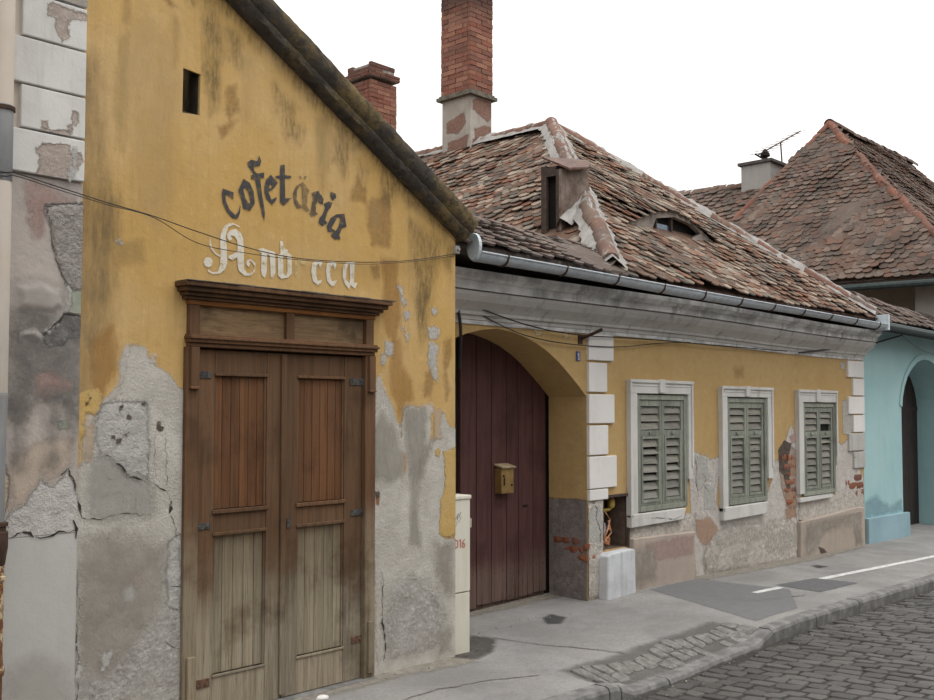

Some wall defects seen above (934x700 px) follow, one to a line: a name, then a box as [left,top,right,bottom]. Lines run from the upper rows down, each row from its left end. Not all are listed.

peeling [47,0,88,41]
peeling [35,110,83,182]
flaking render [42,202,83,347]
peeling [381,341,394,365]
peeling [397,286,410,341]
peeling [427,326,440,382]
peeling [4,344,183,700]
peeling [374,377,456,676]
flaking render [630,426,800,576]
peeling [835,400,864,507]